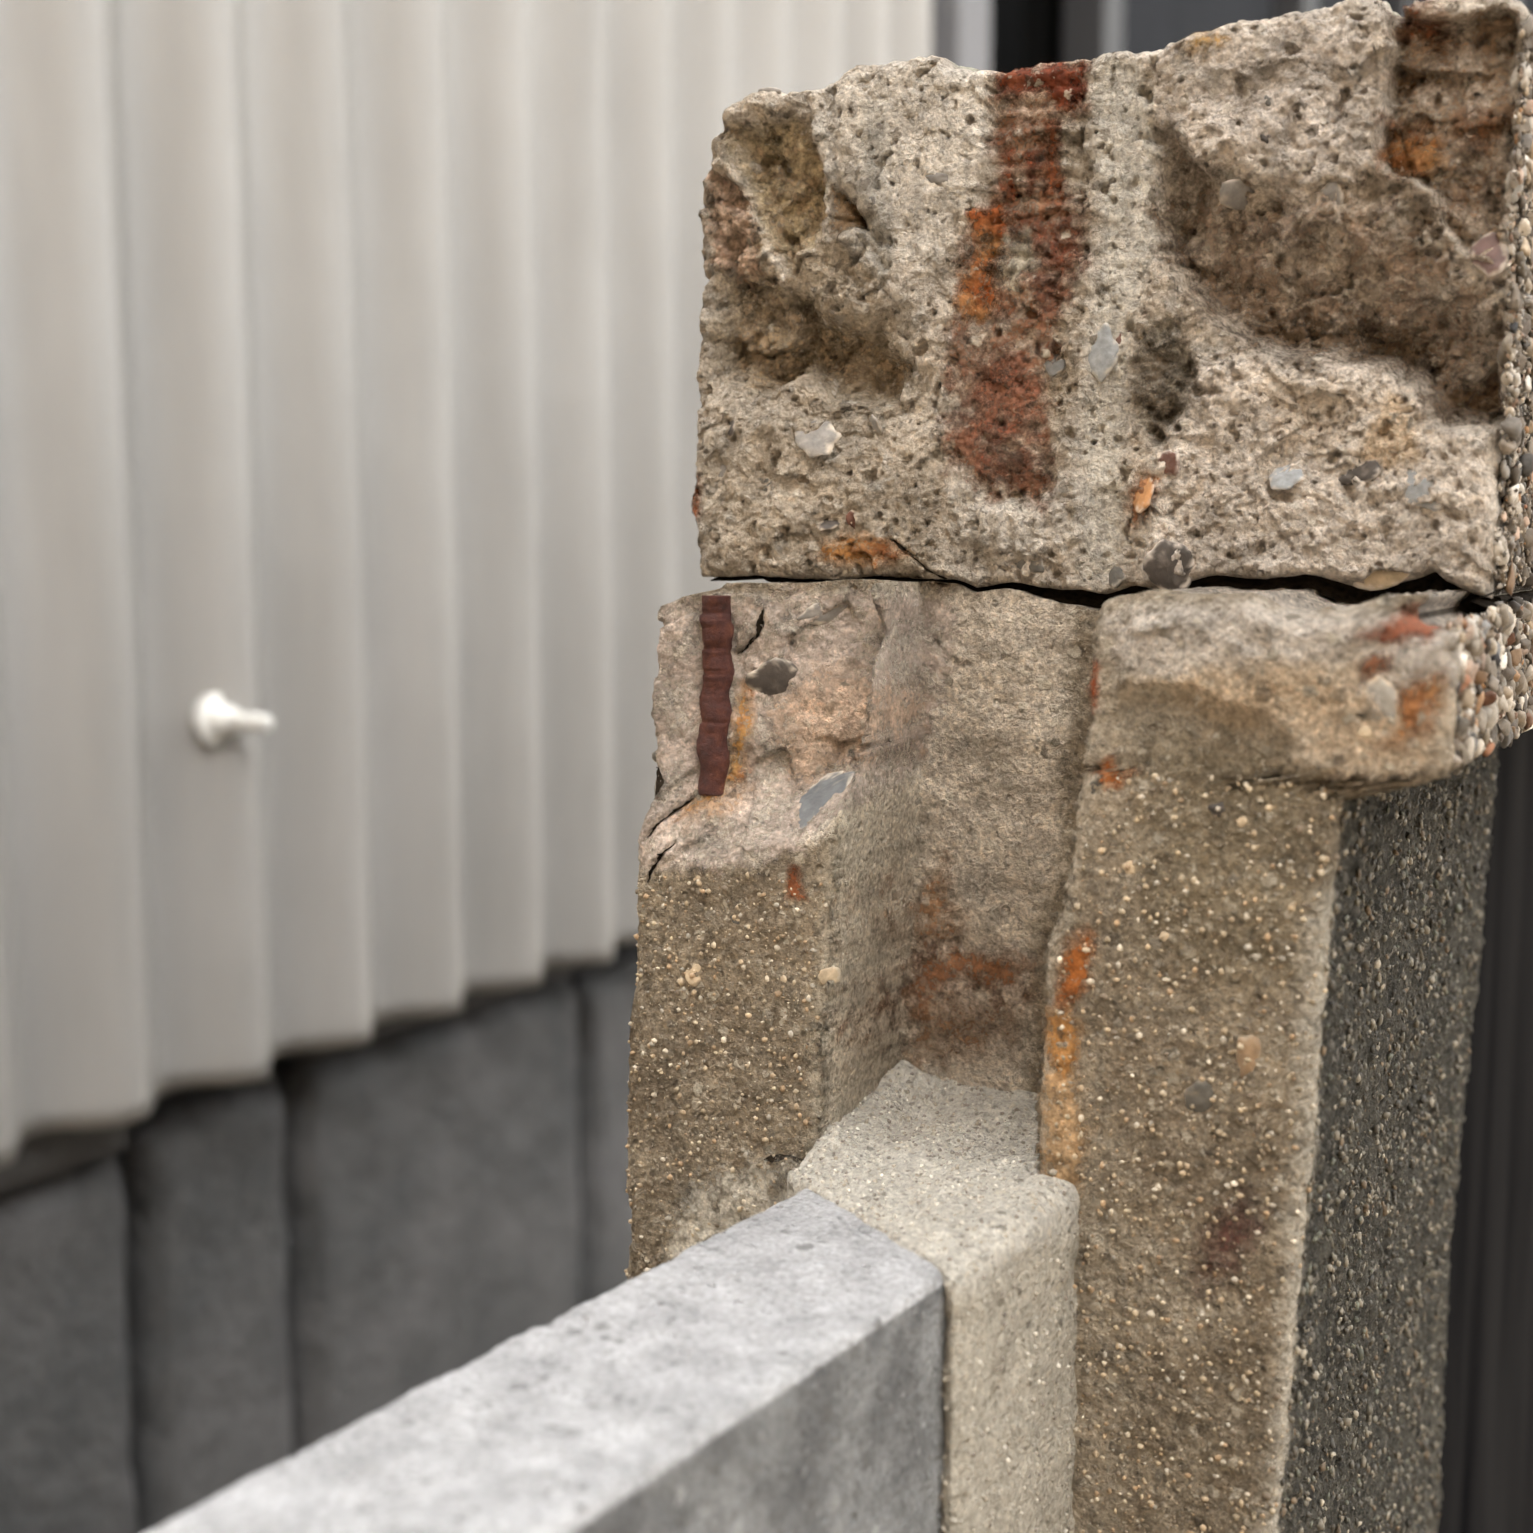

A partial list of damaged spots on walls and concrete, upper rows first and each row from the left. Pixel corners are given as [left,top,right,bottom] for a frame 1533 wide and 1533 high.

spalling [706,170,911,394]
spalling [754,131,867,262]
corrosion [943,62,1089,511]
spalling [1150,10,1518,424]
corrosion [1382,136,1441,177]
spalling [1131,321,1201,430]
crack [709,539,1533,654]
corrosion [1359,604,1440,677]
corrosion [685,683,753,817]
corrosion [1377,673,1446,748]
corrosion [878,851,1029,1067]
corrosion [1039,934,1094,1185]